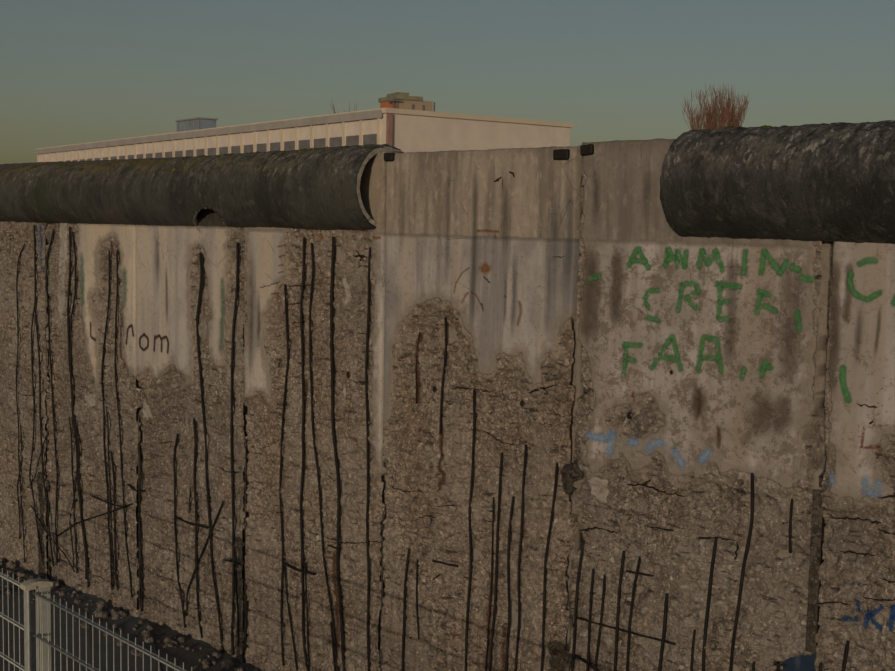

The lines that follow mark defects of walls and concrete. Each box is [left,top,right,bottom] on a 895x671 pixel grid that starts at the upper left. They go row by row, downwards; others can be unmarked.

rust [415,333,423,404]
spalling [0,221,895,671]
crack [830,517,895,535]
crack [840,549,877,557]
crack [818,578,895,605]